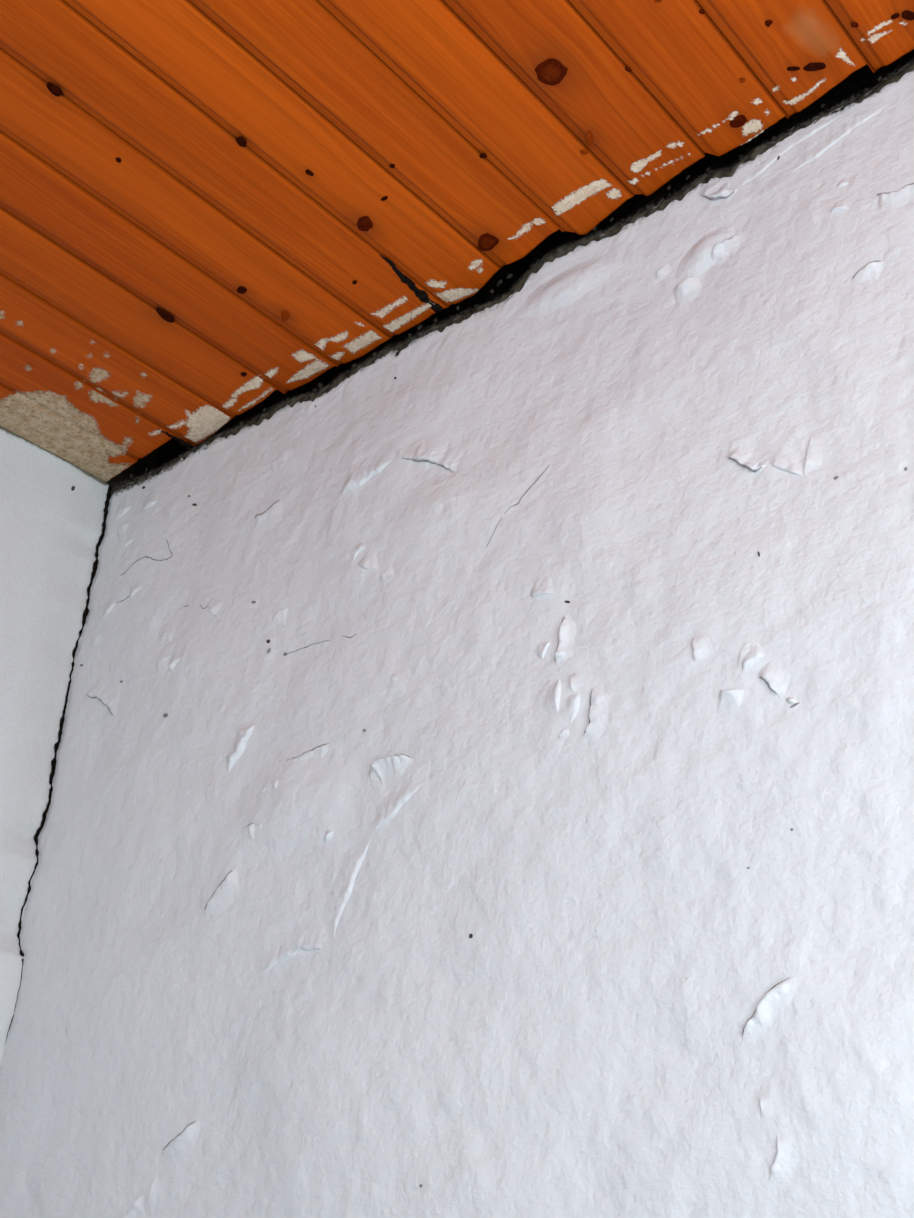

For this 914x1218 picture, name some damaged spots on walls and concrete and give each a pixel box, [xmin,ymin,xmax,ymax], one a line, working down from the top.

peeling [861,20,907,43]
peeling [836,47,855,66]
crack [701,191,735,200]
spalling [111,63,914,494]
crack [4,485,172,1045]